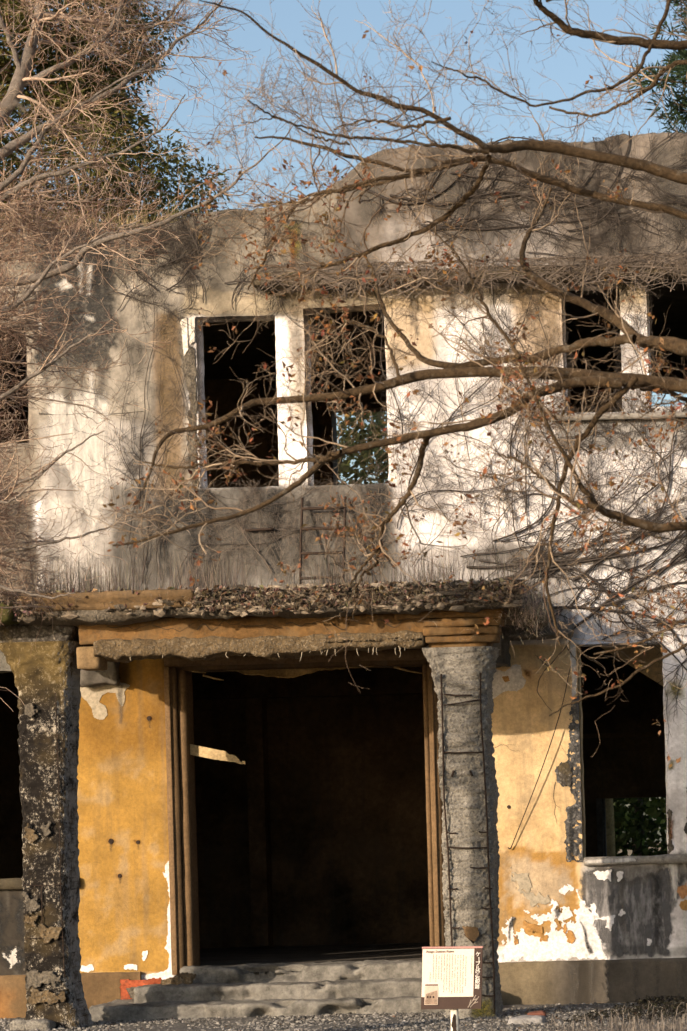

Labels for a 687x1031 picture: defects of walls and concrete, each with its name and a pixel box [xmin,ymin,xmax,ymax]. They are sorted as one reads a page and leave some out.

leakage [423,164,473,244]
leakage [25,220,118,547]
spalling [0,630,610,1031]
spalling [667,809,687,911]